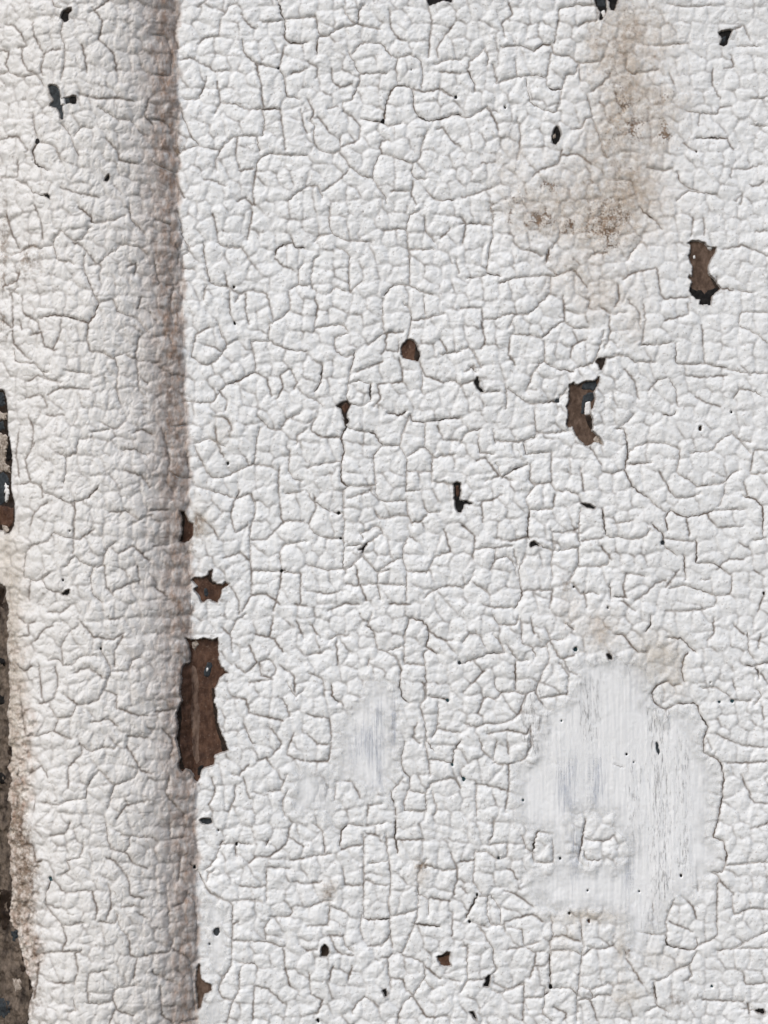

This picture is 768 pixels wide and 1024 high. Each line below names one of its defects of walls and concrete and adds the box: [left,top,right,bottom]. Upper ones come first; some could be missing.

crack [17,113,92,199]
crack [13,204,248,365]
peeling [688,242,720,305]
peeling [566,358,605,446]
peeling [0,390,15,533]
crack [17,429,146,504]
crack [23,510,149,602]
peeling [193,571,228,602]
crack [152,4,768,1024]
peeling [177,638,228,782]
peeling [0,584,33,1024]
crack [17,742,182,853]